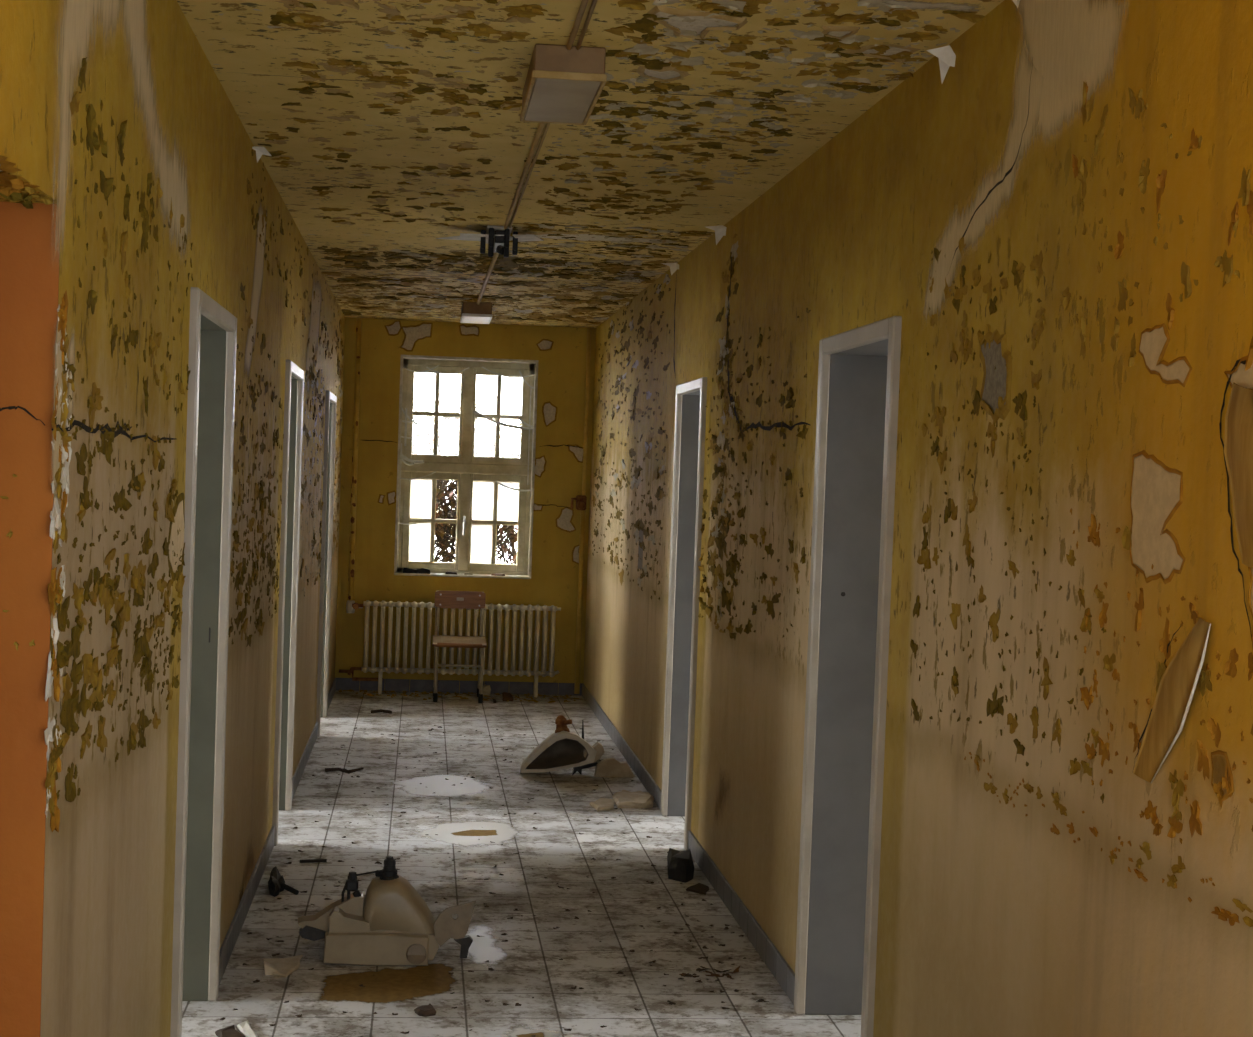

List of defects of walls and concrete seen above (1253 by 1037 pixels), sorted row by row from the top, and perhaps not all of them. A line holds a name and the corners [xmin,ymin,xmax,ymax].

crack [0,406,176,443]
flaking render [44,277,186,833]
peeling [69,57,193,428]
peeling [228,282,284,647]
flaking render [247,0,985,640]
peeling [910,237,1253,889]
peeling [1072,81,1124,259]
peeling [1102,158,1168,250]
peeling [1214,168,1253,288]
peeling [1211,898,1253,927]